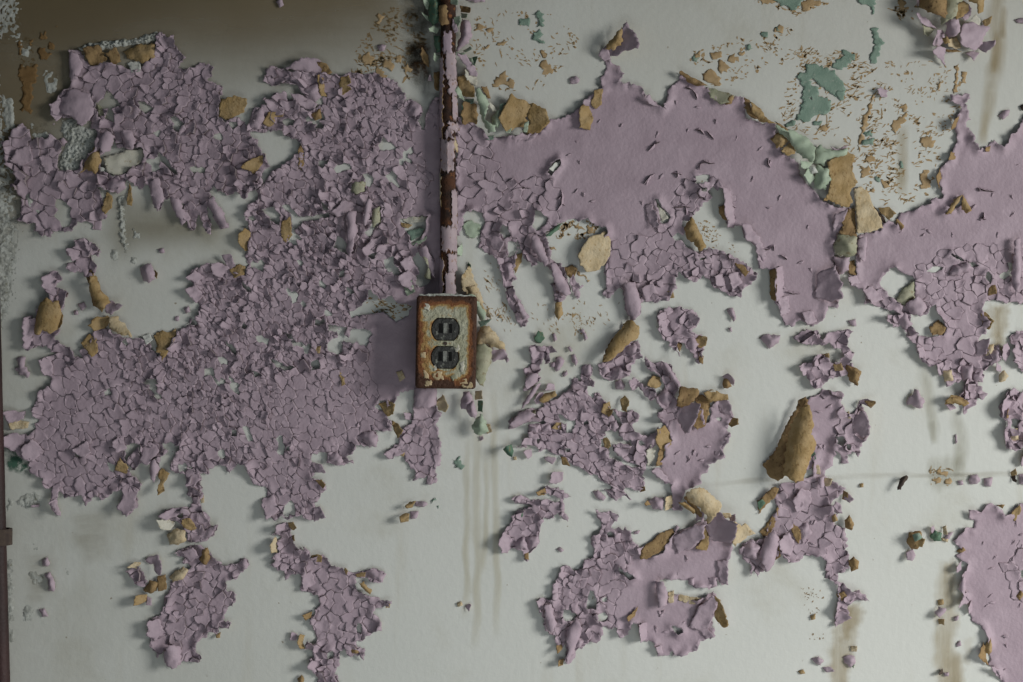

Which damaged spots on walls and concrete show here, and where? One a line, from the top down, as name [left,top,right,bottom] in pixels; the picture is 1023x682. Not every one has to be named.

peeling [0,0,1023,545]
flaking render [7,559,48,642]
peeling [125,554,167,606]
peeling [146,544,250,669]
peeling [269,522,392,682]
peeling [498,345,755,667]
peeling [739,329,876,627]
peeling [843,646,857,668]
peeling [906,503,1023,682]